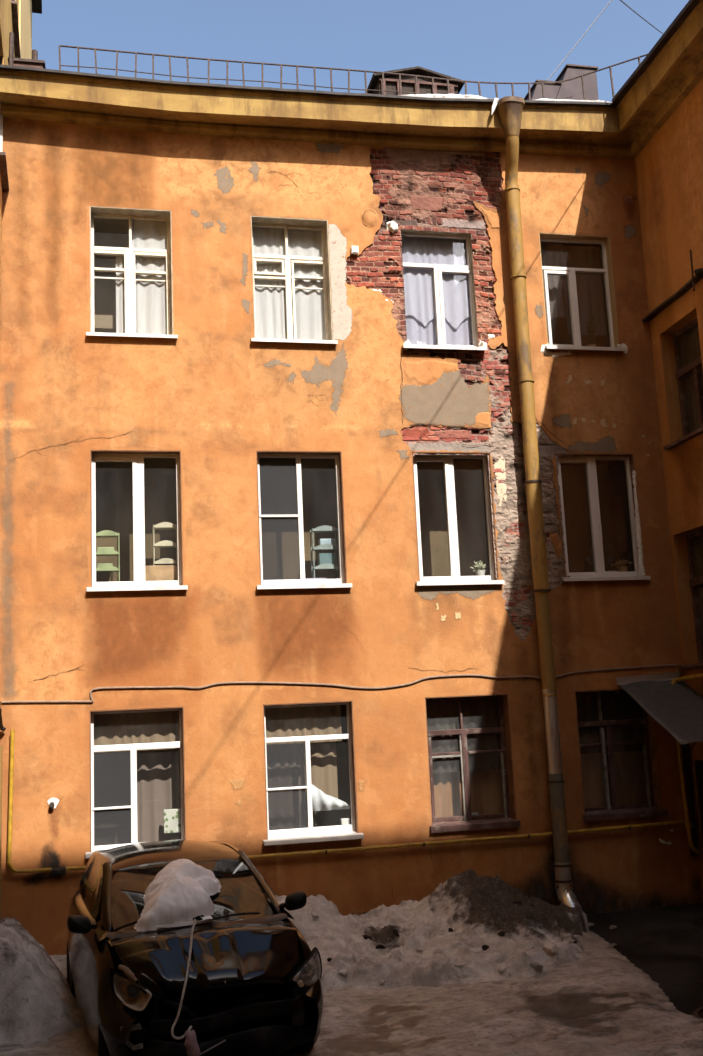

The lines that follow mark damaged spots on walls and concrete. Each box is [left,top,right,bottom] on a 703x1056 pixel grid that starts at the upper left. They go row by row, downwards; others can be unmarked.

flaking render [214,166,235,194]
flaking render [263,147,536,642]
crack [9,431,131,461]
spalling [536,414,617,590]
water stain [519,851,560,906]
water stain [569,855,703,914]